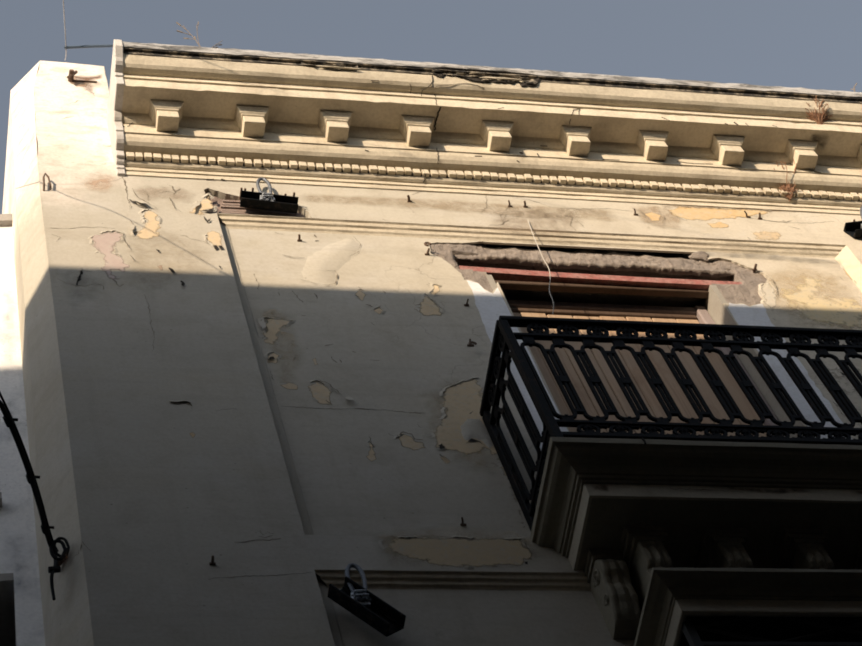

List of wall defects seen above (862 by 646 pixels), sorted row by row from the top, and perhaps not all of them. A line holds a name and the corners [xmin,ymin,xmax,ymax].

crack [405,71,483,213]
peeling [87,188,163,286]
flaking render [169,193,303,249]
peeling [633,205,772,228]
peeling [416,282,446,316]
flaking render [429,243,862,327]
peeling [258,315,296,380]
peeling [429,377,497,464]